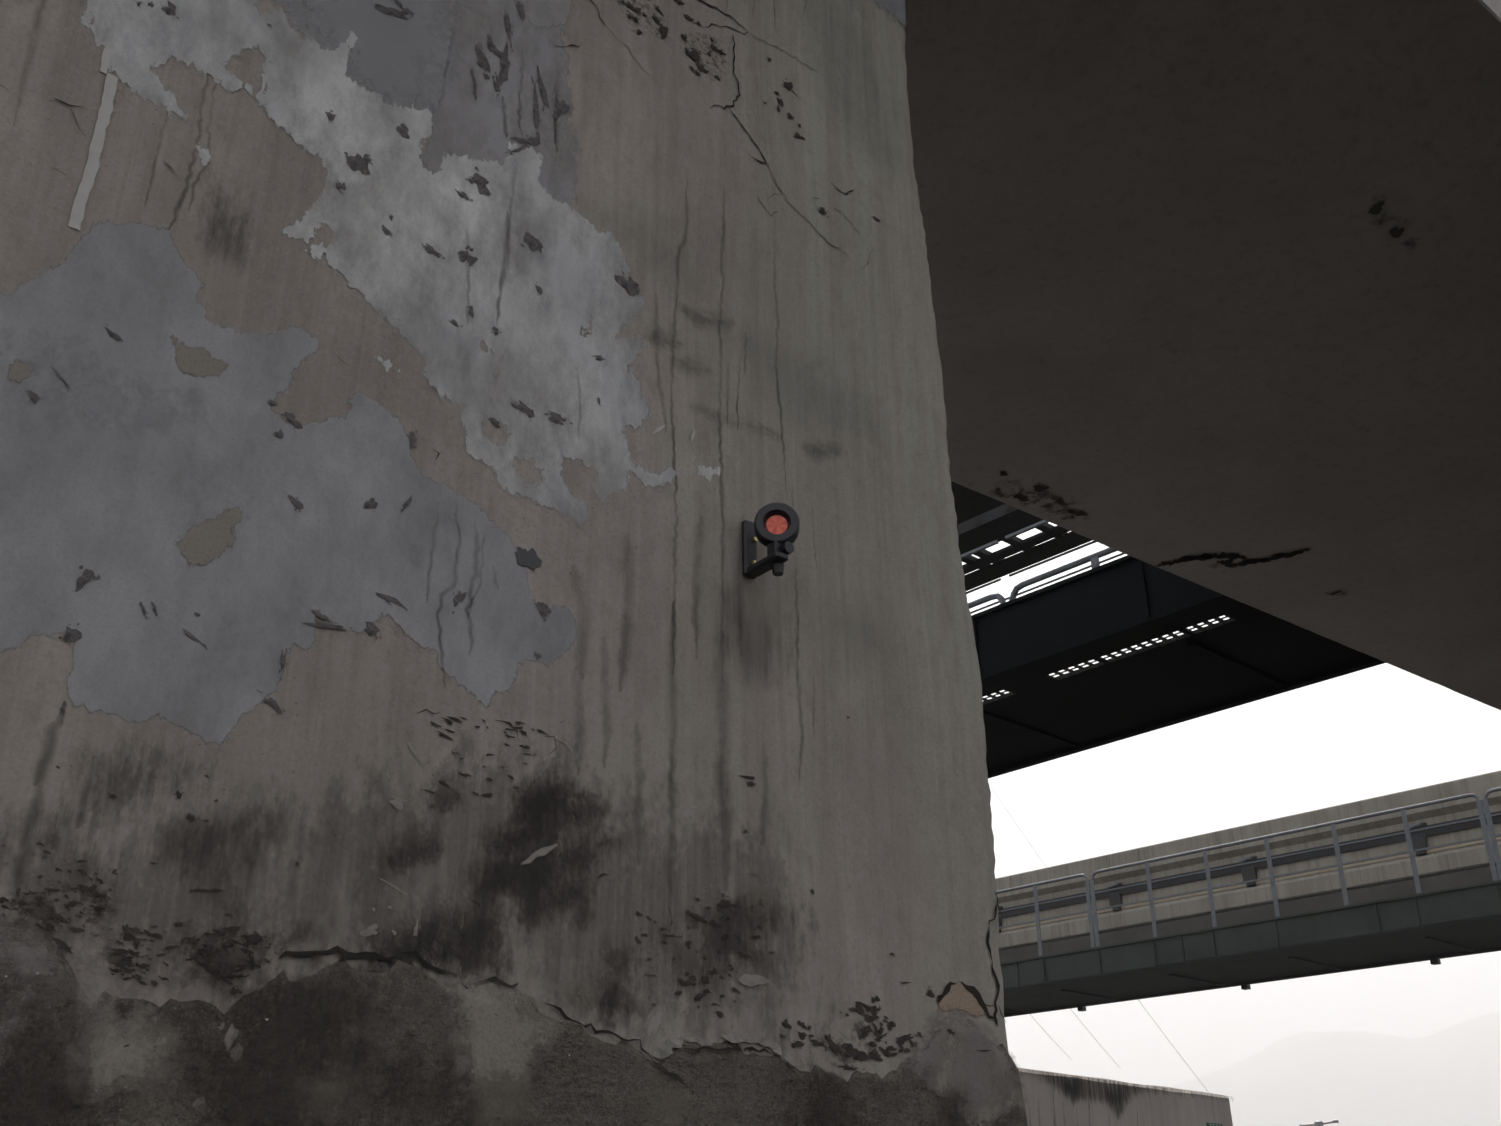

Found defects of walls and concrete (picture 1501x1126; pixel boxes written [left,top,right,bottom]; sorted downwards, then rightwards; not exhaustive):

peeling [470,0,525,100]
spalling [621,0,726,81]
peeling [334,152,373,193]
crack [699,0,870,269]
crack [1156,548,1310,568]
leakage [370,713,607,1126]
crack [985,891,1006,1026]
leakage [78,992,174,1093]
leakage [192,976,366,1126]
crack [279,945,685,1085]
leakage [645,1005,801,1066]
spalling [780,996,922,1073]